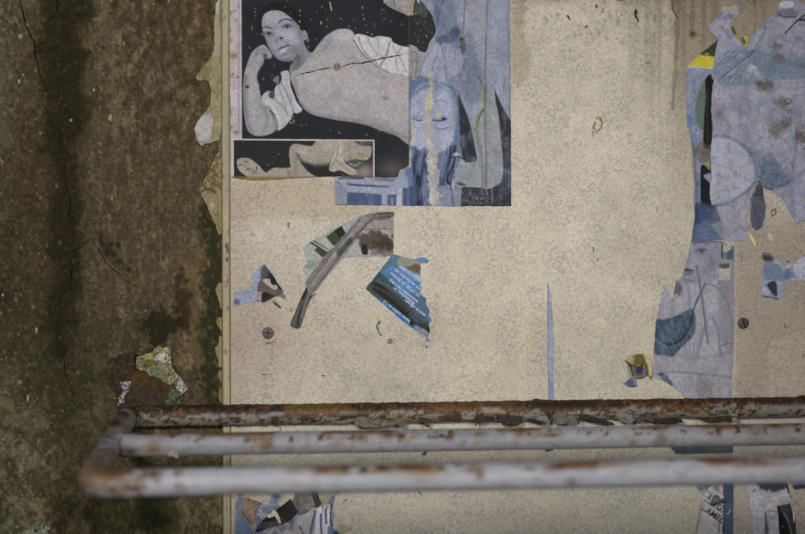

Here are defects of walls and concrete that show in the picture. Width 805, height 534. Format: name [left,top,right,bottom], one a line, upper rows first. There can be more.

crack [16,0,82,103]
peeling [194,0,222,235]
flaking render [106,346,188,412]